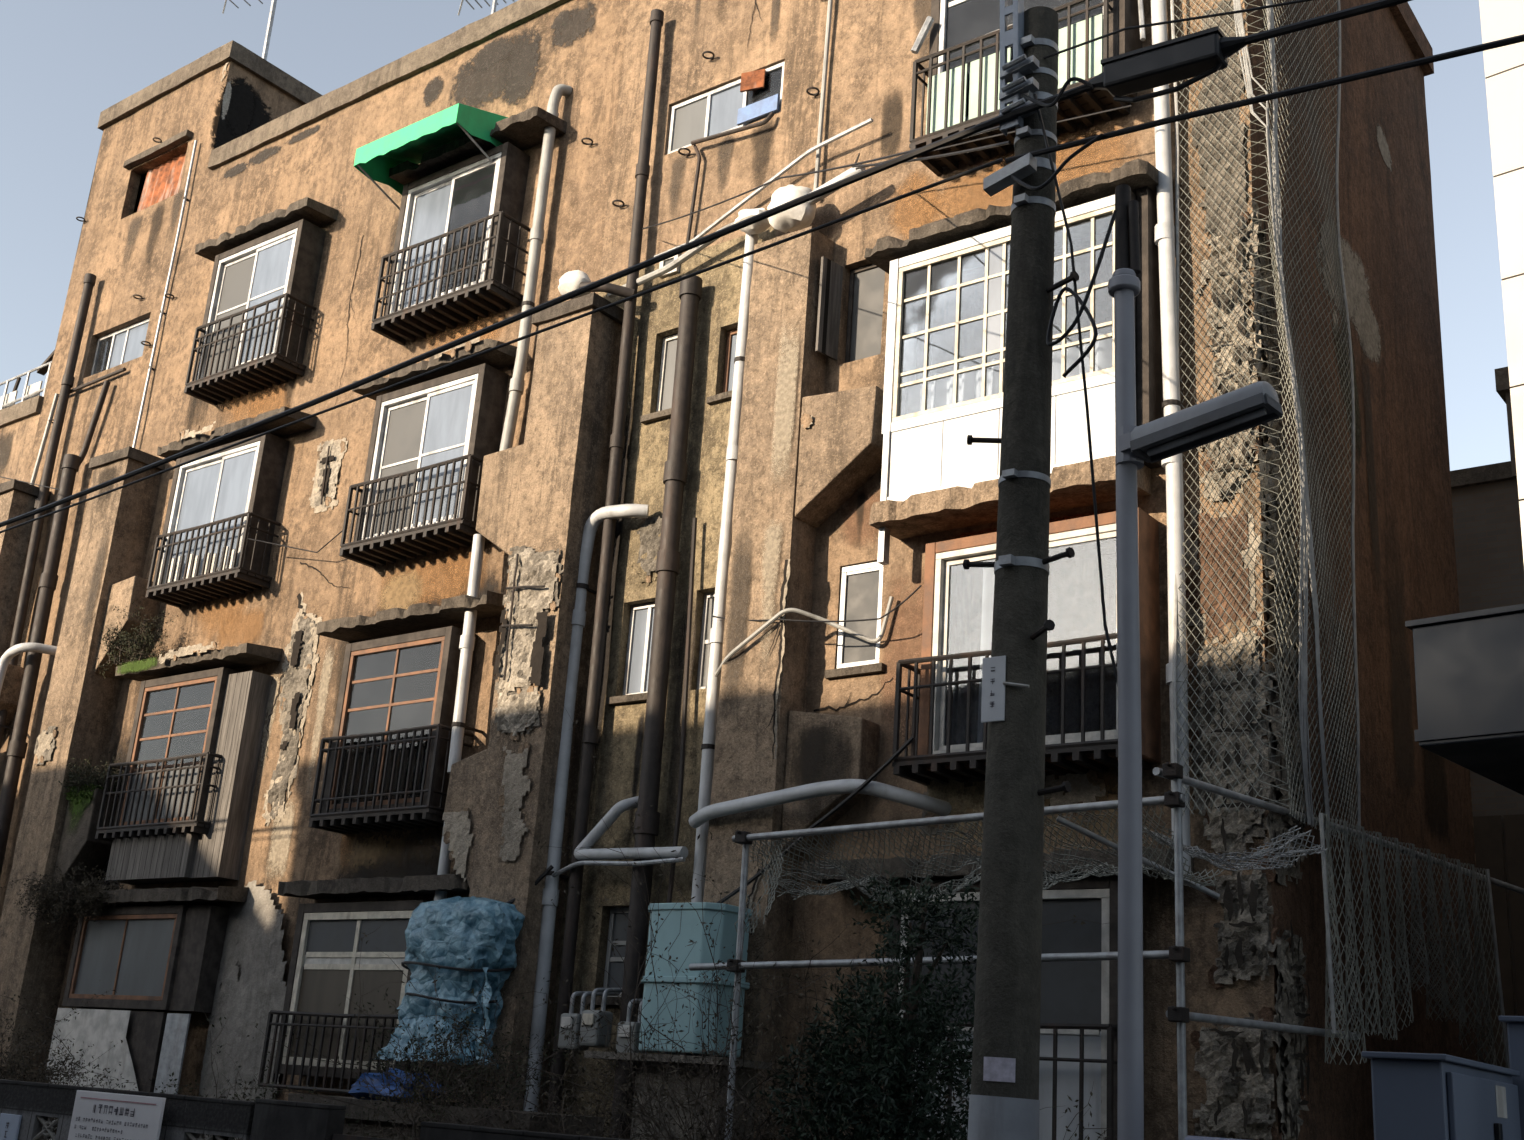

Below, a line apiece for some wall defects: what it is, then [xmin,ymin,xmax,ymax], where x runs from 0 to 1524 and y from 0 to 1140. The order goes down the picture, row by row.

water stain [771,0,780,35]
spalling [262,608,322,824]
spalling [309,438,348,513]
spalling [493,545,564,862]
crack [765,559,790,759]
crack [814,677,893,712]
spalling [1185,0,1310,1140]